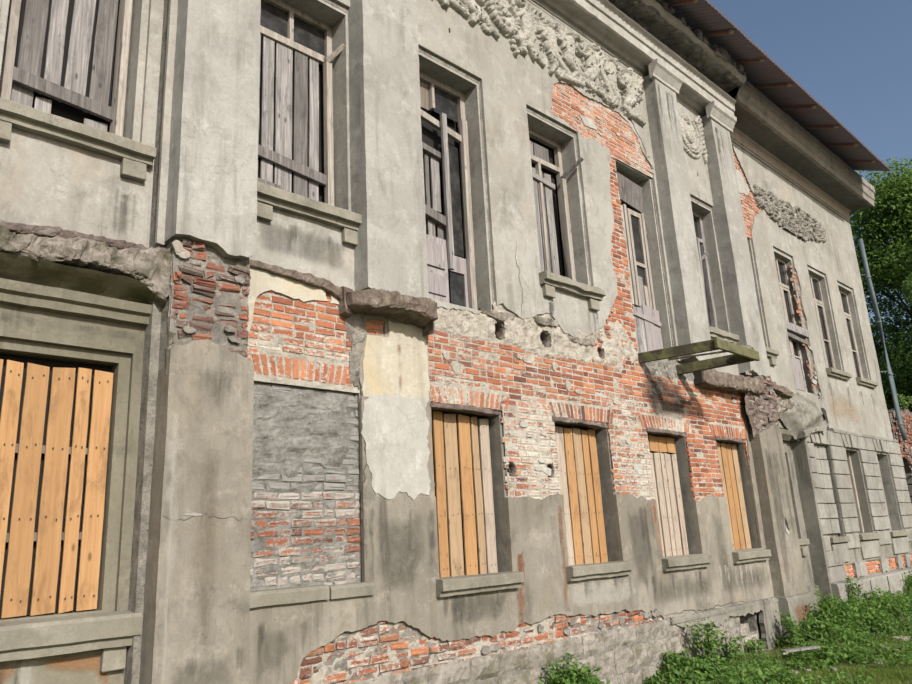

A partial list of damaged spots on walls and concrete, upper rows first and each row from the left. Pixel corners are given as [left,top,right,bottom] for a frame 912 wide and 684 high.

spalling [166,238,360,393]
spalling [428,82,800,501]
crack [164,513,245,521]
spalling [291,609,663,684]